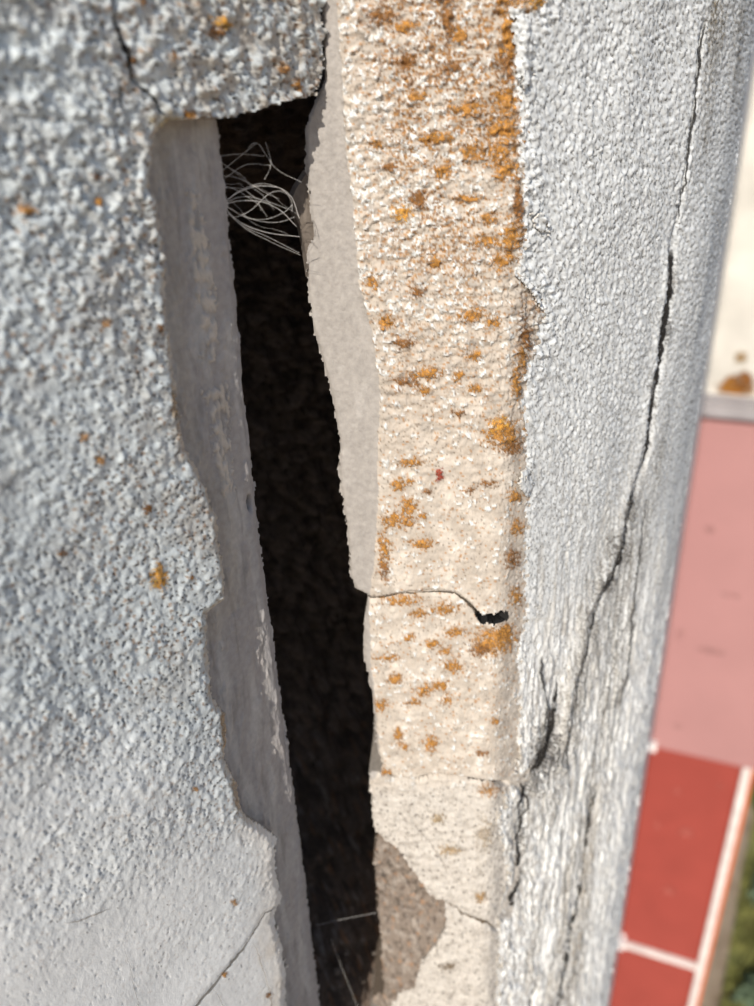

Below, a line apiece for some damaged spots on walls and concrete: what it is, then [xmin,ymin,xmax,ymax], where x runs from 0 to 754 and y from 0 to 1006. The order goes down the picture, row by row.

crack [112,0,162,119]
corrosion [391,189,428,224]
corrosion [419,0,546,276]
crack [678,26,705,216]
corrosion [391,365,481,396]
crack [642,252,674,463]
crack [216,8,475,1006]
corrosion [377,457,443,585]
corrosion [403,624,518,707]
crack [508,498,646,906]
leakage [558,482,656,767]
spalling [372,832,445,1006]